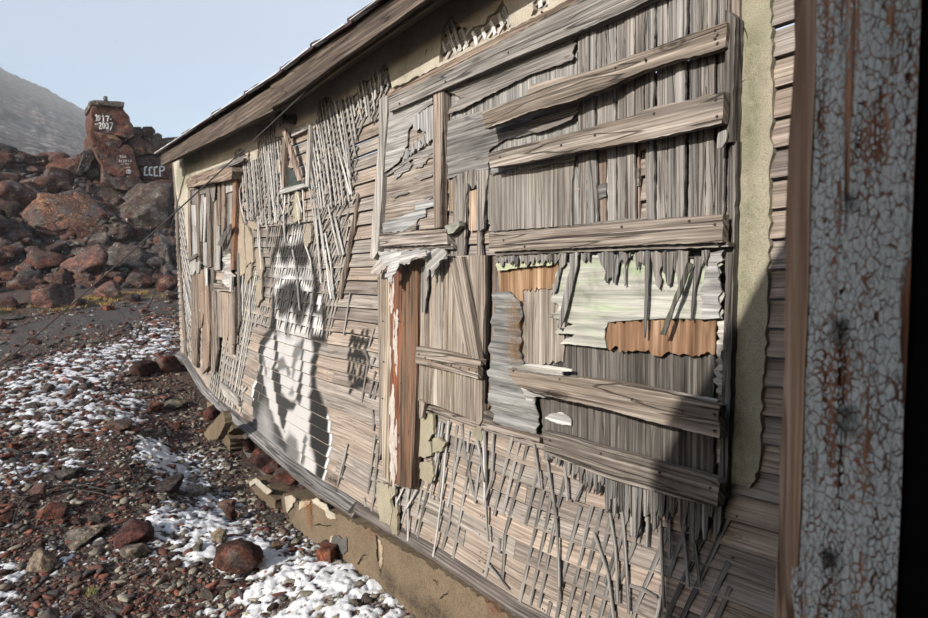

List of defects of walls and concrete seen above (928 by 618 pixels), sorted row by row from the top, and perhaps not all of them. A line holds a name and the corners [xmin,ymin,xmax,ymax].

flaking render [442,6,510,60]
flaking render [209,69,434,414]
flaking render [336,444,348,488]
flaking render [361,248,733,618]
peeling [790,0,921,618]